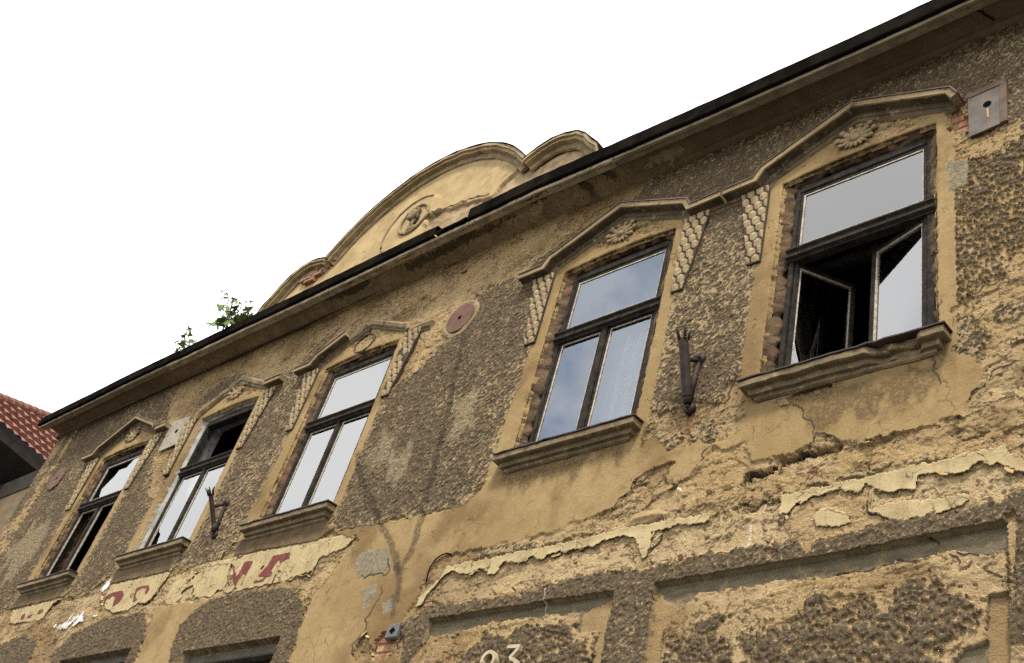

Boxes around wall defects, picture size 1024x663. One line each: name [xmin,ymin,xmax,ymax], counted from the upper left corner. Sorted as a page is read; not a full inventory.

flaking render [415,391,1024,607]
crack [739,404,842,525]
peeling [8,534,359,630]
crack [351,559,390,657]
flaking render [352,631,397,663]